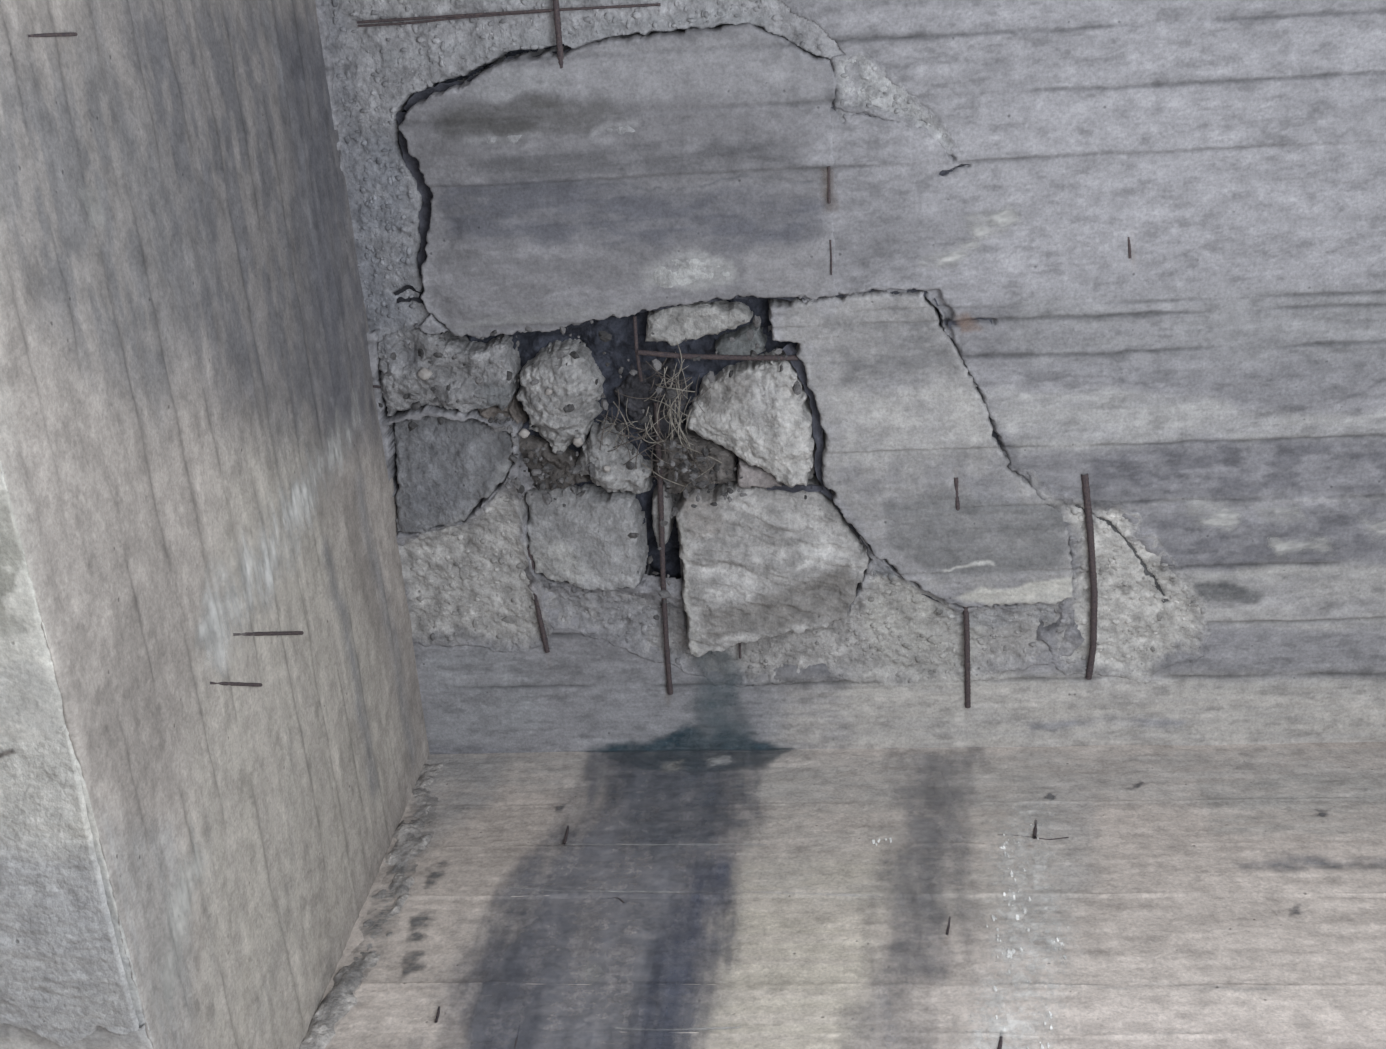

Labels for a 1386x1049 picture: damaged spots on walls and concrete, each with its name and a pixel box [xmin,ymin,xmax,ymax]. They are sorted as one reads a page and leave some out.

crack [393,49,572,305]
crack [939,155,969,176]
peeling [322,0,1212,691]
crack [589,288,1001,447]
crack [767,344,941,603]
crack [1075,504,1170,603]
water stain [469,655,791,1049]
water stain [897,755,974,933]